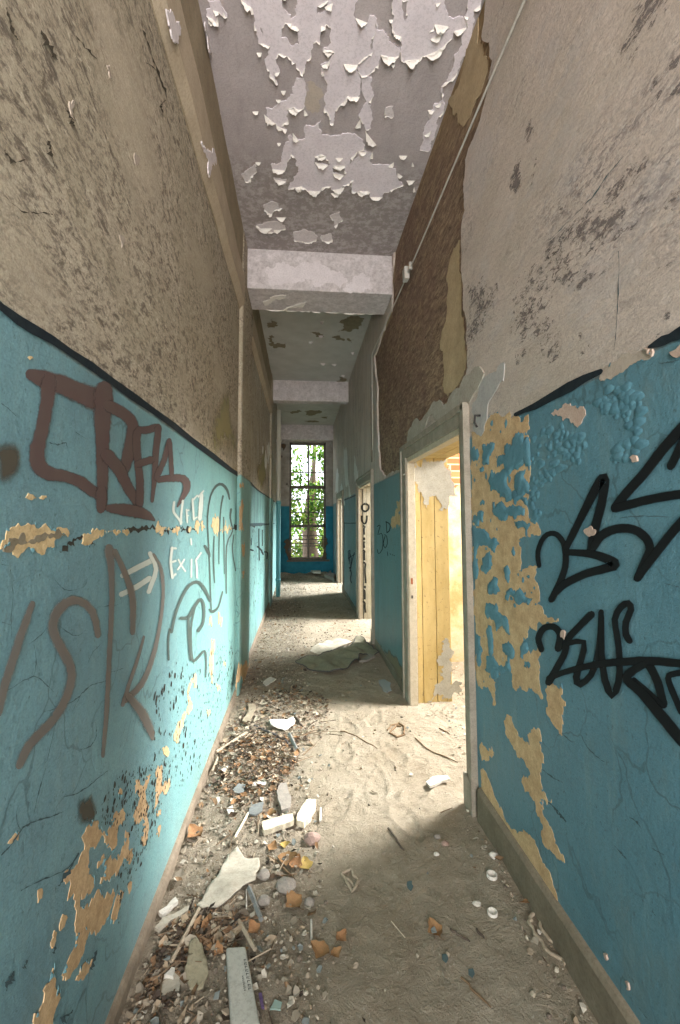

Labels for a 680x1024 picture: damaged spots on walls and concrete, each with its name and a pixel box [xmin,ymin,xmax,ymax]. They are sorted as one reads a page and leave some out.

peeling [165,9,181,44]
peeling [204,0,227,55]
peeling [201,141,217,178]
flaking render [241,0,566,735]
flaking render [0,522,70,558]
flaking render [81,526,129,547]
flaking render [155,482,265,604]
peeling [32,612,249,1024]
peeling [479,714,565,901]